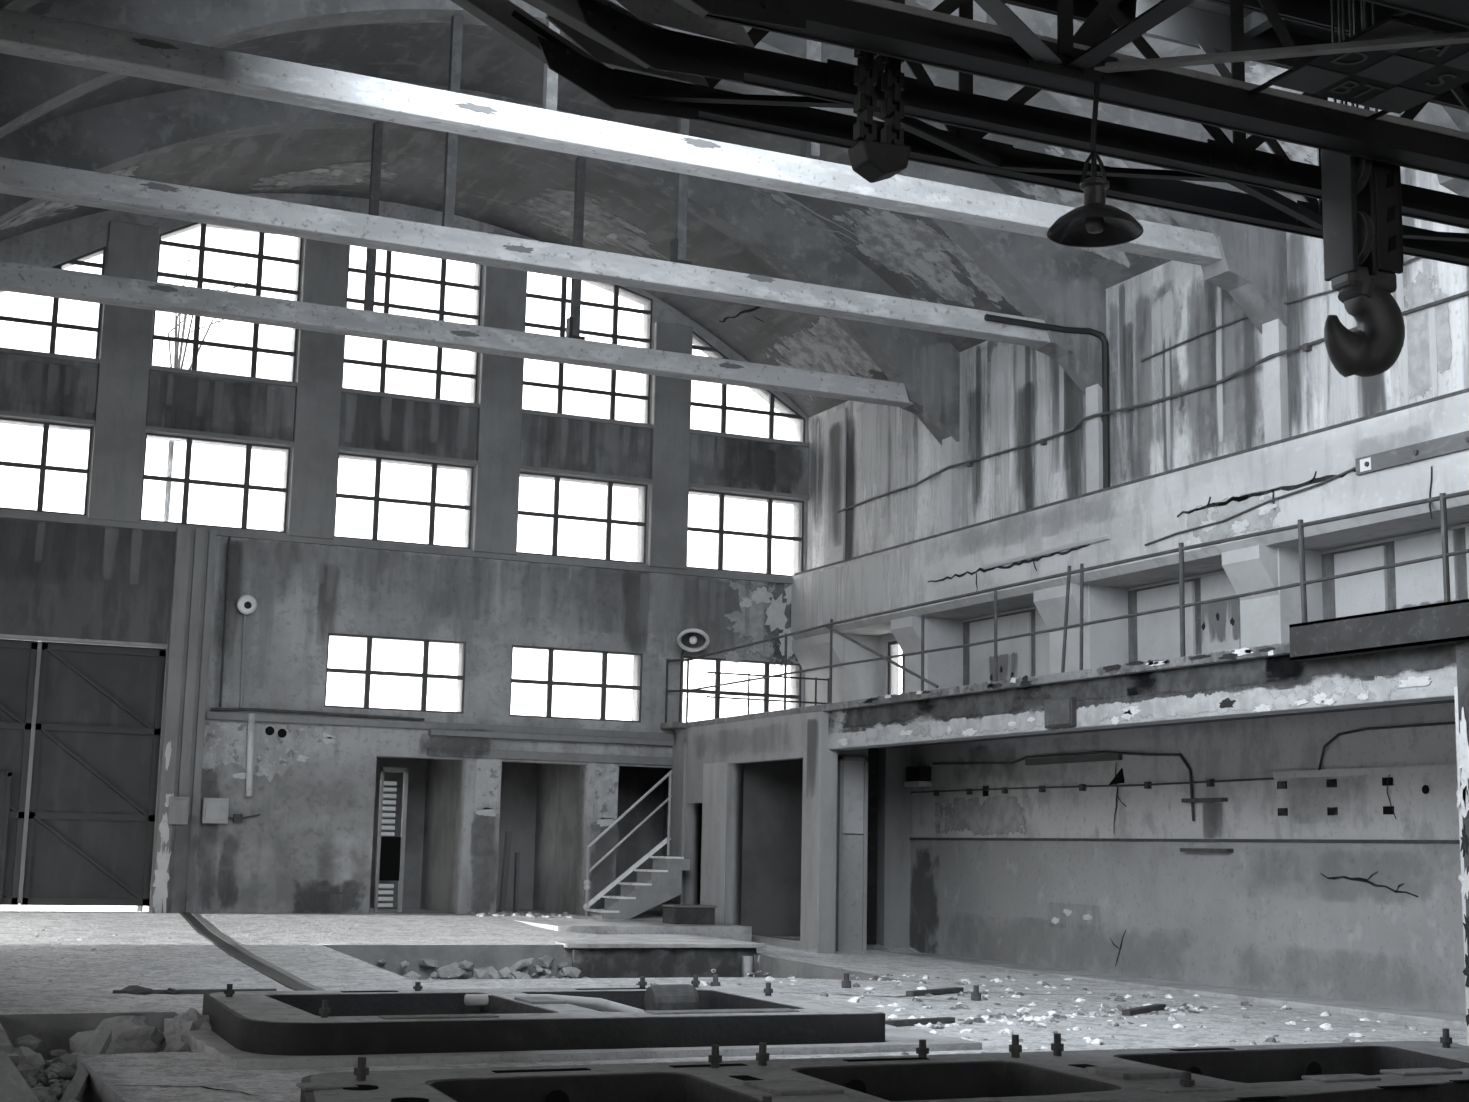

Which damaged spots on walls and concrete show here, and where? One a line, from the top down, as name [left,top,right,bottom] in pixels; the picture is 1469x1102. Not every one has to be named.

water stain [1401,168,1411,185]
water stain [967,341,1081,514]
water stain [1109,281,1263,483]
water stain [1287,235,1380,425]
water stain [1397,254,1452,405]
peeling [724,579,796,664]
peeling [837,675,1431,746]
crack [1320,872,1418,897]
spalling [1456,707,1469,988]